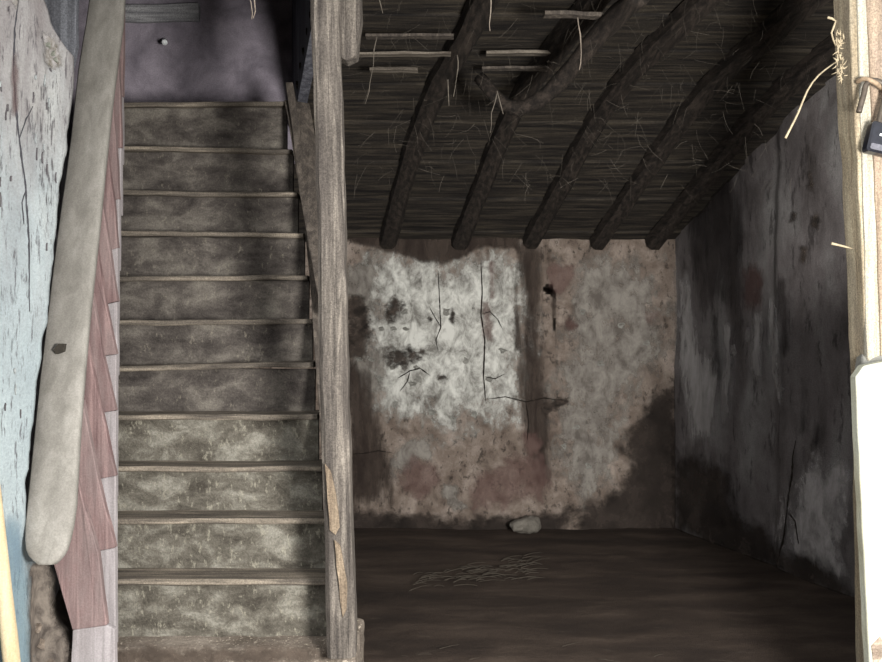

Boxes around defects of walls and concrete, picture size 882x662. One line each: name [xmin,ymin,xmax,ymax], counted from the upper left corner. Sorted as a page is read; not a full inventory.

crack [13,0,33,312]
leakage [349,362,514,530]
crack [430,271,441,349]
leakage [347,237,569,484]
crack [481,268,566,439]
leakage [538,179,851,594]
crack [776,441,799,569]